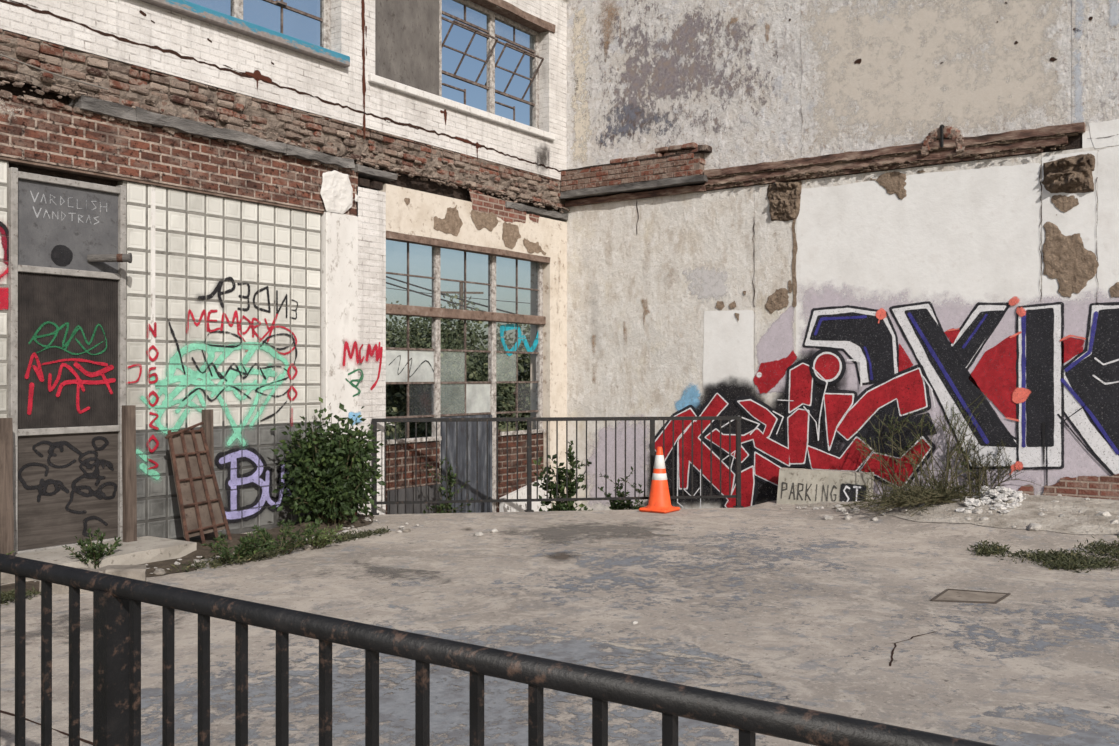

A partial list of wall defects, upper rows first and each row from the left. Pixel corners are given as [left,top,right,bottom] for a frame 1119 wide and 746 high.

spalling [0,29,570,255]
flaking render [870,170,925,200]
flaking render [1042,195,1099,297]
flaking render [1109,282,1119,298]
crack [885,631,937,666]